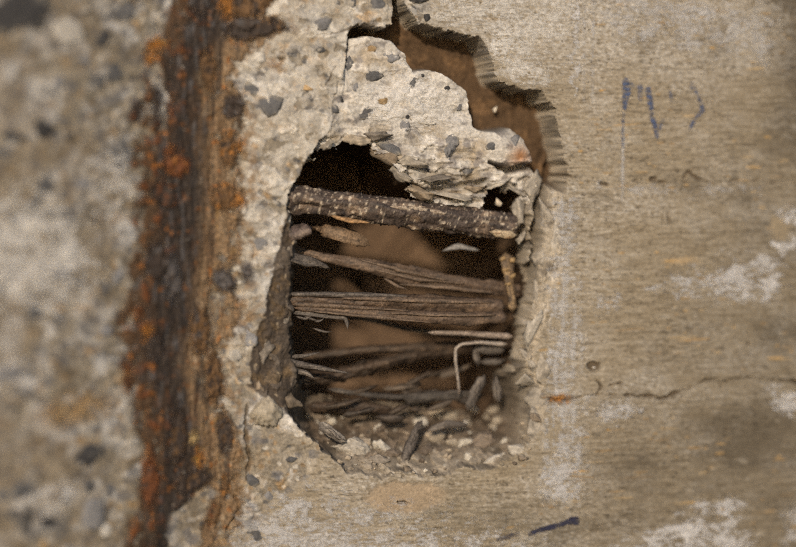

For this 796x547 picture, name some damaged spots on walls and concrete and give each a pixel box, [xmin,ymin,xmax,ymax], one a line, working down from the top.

rust [287,185,520,240]
spalling [0,0,173,547]
rust [115,0,289,547]
spalling [164,0,569,547]
rust [299,341,513,387]
crack [546,377,796,402]
efflorescence [636,498,757,547]